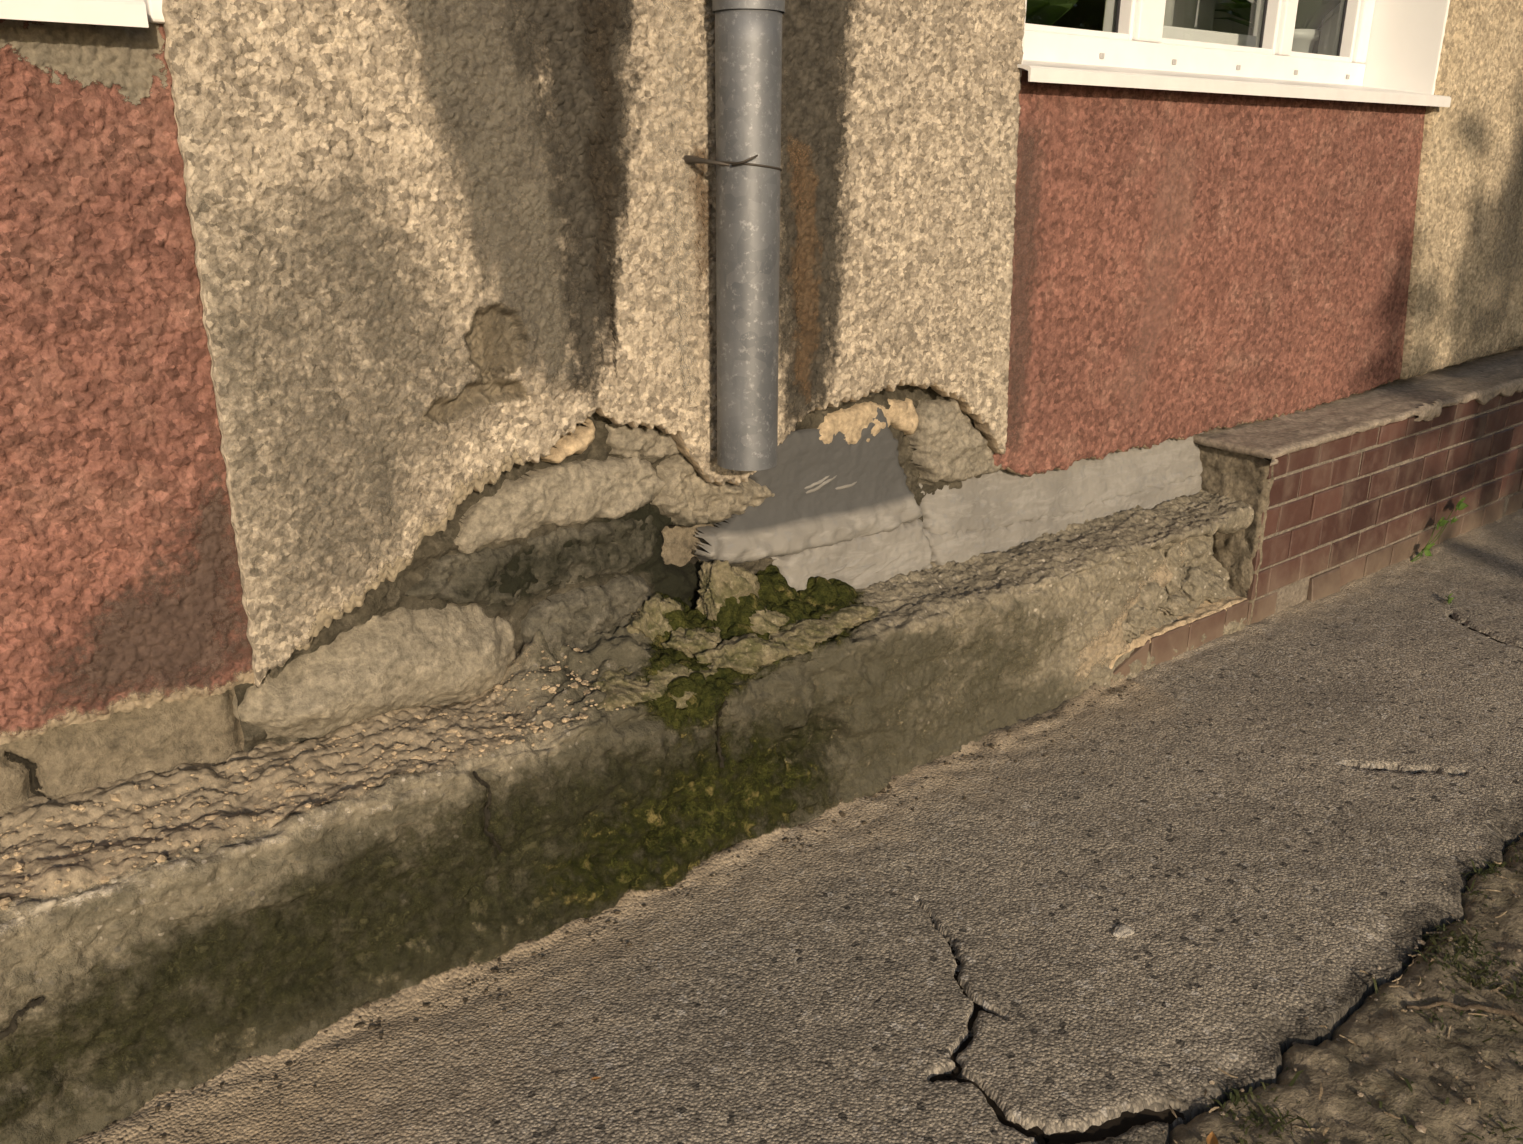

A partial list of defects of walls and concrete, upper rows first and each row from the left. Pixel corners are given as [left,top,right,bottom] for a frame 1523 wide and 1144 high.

peeling [0,19,168,105]
leakage [397,0,642,398]
leakage [779,0,859,430]
spalling [421,302,530,424]
spalling [795,385,1002,522]
spalling [0,412,880,752]
crack [5,752,51,800]
crack [924,911,1185,1144]